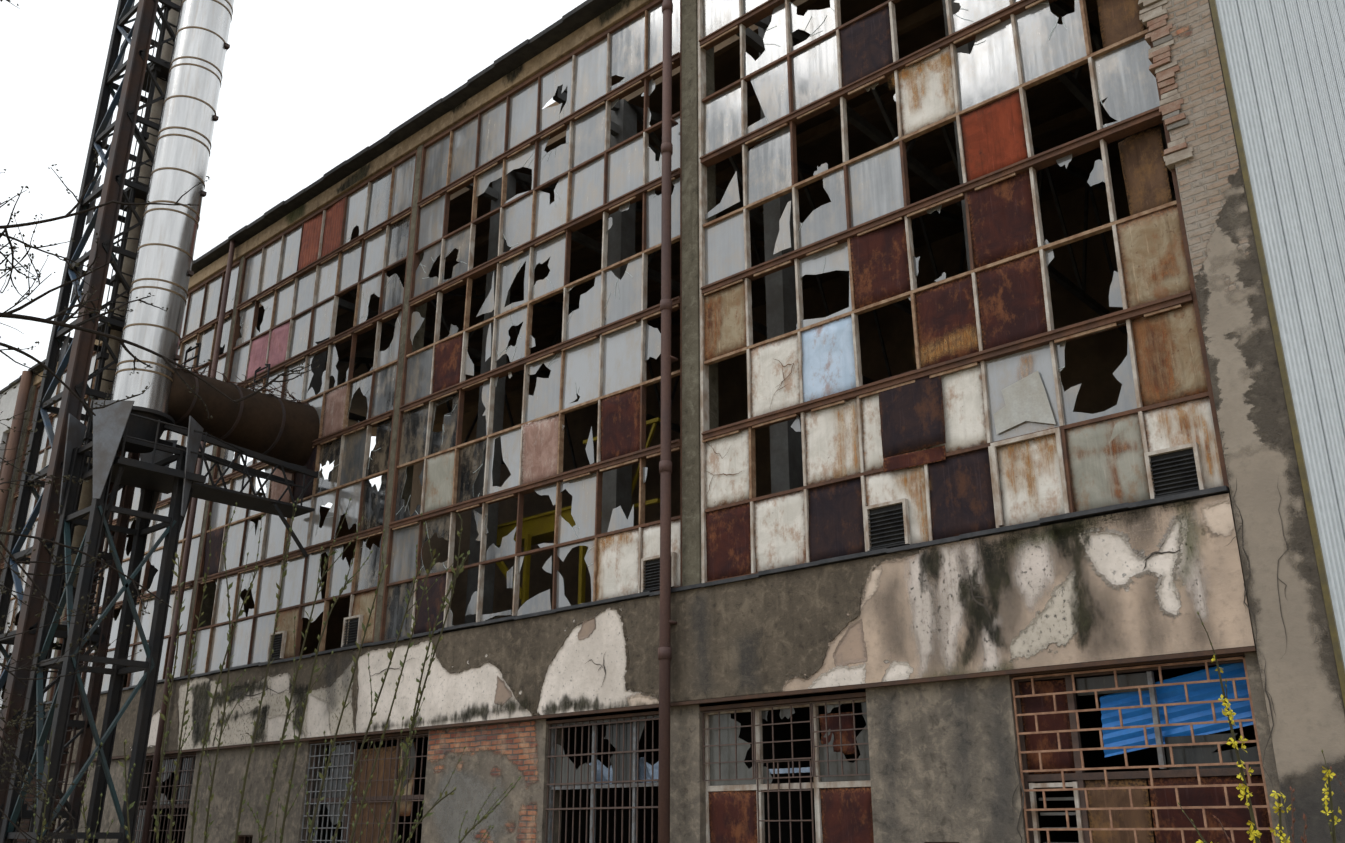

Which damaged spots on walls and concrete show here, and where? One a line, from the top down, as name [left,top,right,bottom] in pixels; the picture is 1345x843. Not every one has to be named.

rust [894,54,953,108]
spalling [782,0,1345,782]
rust [1002,434,1056,492]
rust [1107,441,1130,498]
water stain [908,498,1206,675]
water stain [191,681,268,747]
water stain [293,685,309,735]
spalling [130,606,659,843]